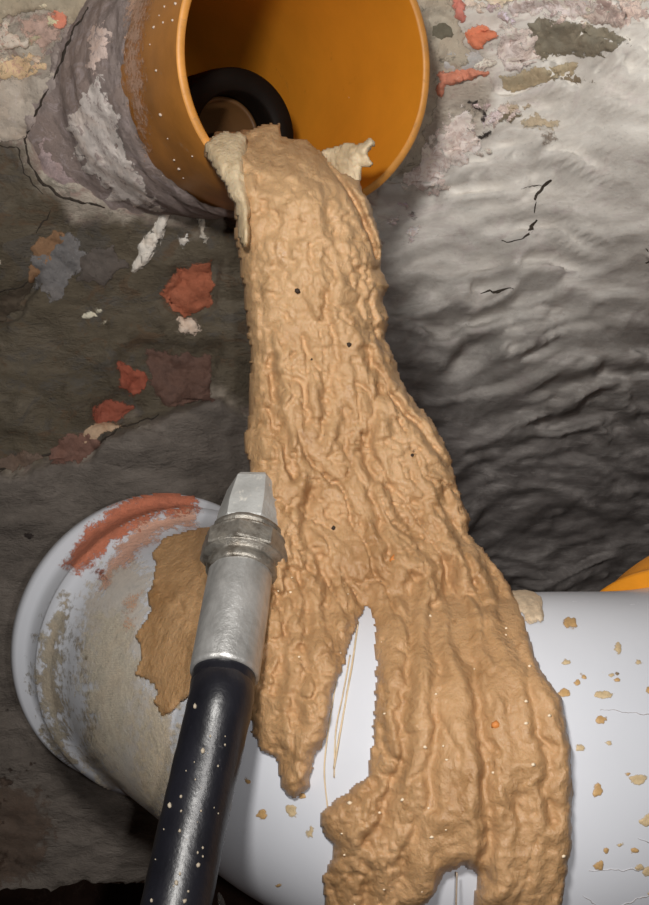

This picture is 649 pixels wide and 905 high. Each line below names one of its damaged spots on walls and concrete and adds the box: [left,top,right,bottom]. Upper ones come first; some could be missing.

flaking render [39,4,67,29]
peeling [0,20,47,80]
peeling [387,0,649,242]
crack [502,179,552,243]
spalling [0,230,129,322]
flaking render [159,260,216,318]
flaking render [92,348,215,424]
spalling [0,433,101,473]
crack [100,414,159,444]